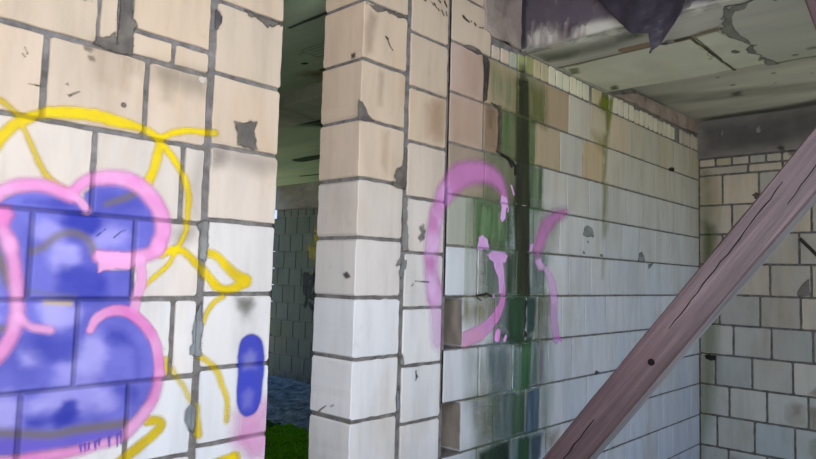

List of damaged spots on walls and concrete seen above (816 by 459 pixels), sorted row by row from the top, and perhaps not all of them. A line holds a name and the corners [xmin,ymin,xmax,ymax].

spalling [245,10,283,27]
crack [691,38,736,71]
peeling [720,2,778,66]
water stain [600,86,618,133]
water stain [465,78,552,459]